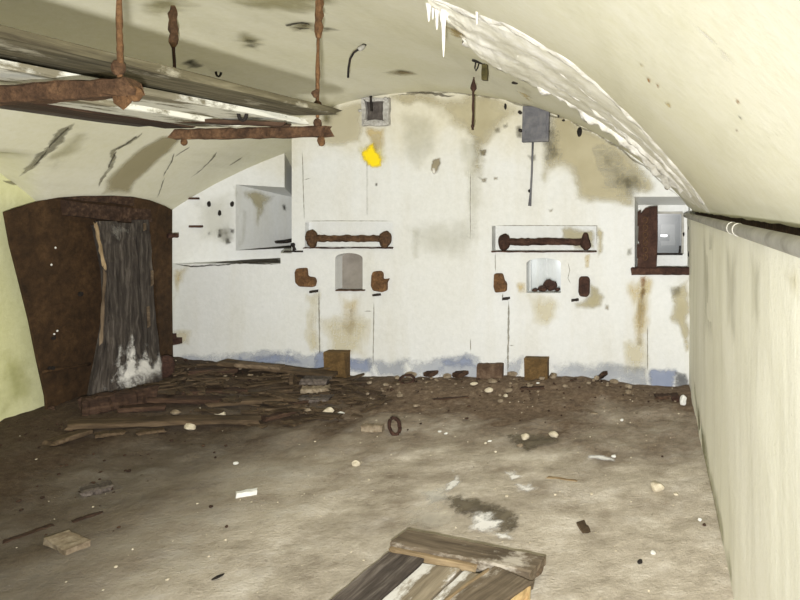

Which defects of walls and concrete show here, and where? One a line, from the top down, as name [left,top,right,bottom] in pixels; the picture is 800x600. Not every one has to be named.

crack [5,127,70,184]
crack [99,134,142,185]
leakage [399,94,508,167]
leakage [547,118,651,204]
corrosion [638,278,649,325]